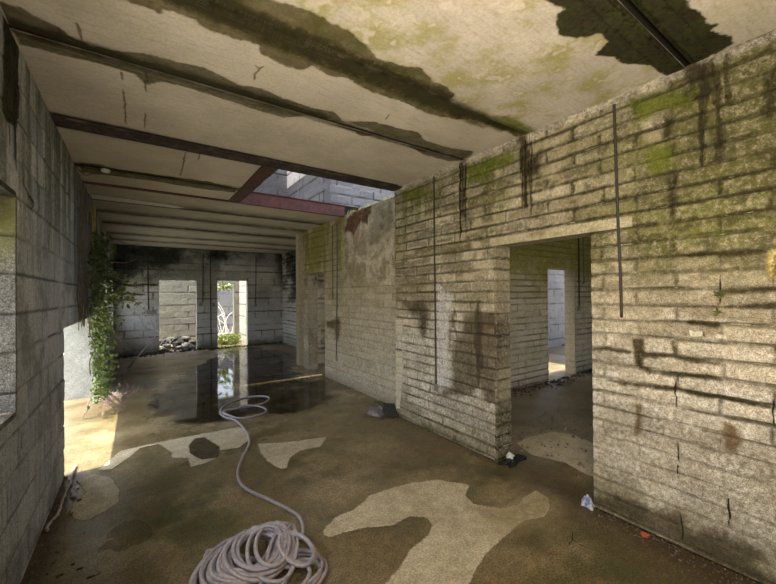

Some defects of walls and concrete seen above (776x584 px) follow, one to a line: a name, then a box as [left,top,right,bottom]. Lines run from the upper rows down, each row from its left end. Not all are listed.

water stain [2,13,136,171]
water stain [146,0,540,219]
water stain [547,0,733,169]
water stain [434,283,453,387]
crack [594,507,762,584]
crack [725,498,733,526]